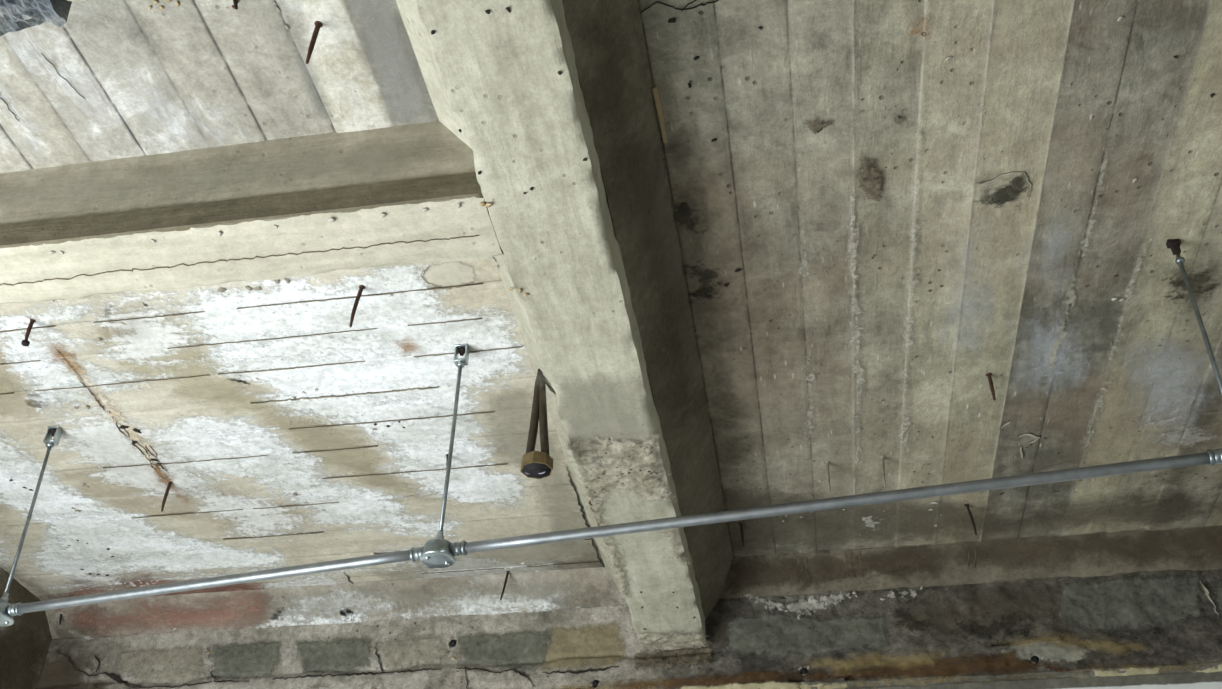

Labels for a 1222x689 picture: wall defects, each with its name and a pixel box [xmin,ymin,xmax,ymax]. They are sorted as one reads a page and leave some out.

spalling [0,0,72,36]
crack [641,0,719,13]
leakage [978,171,1031,207]
leakage [101,328,412,492]
crack [56,645,533,688]